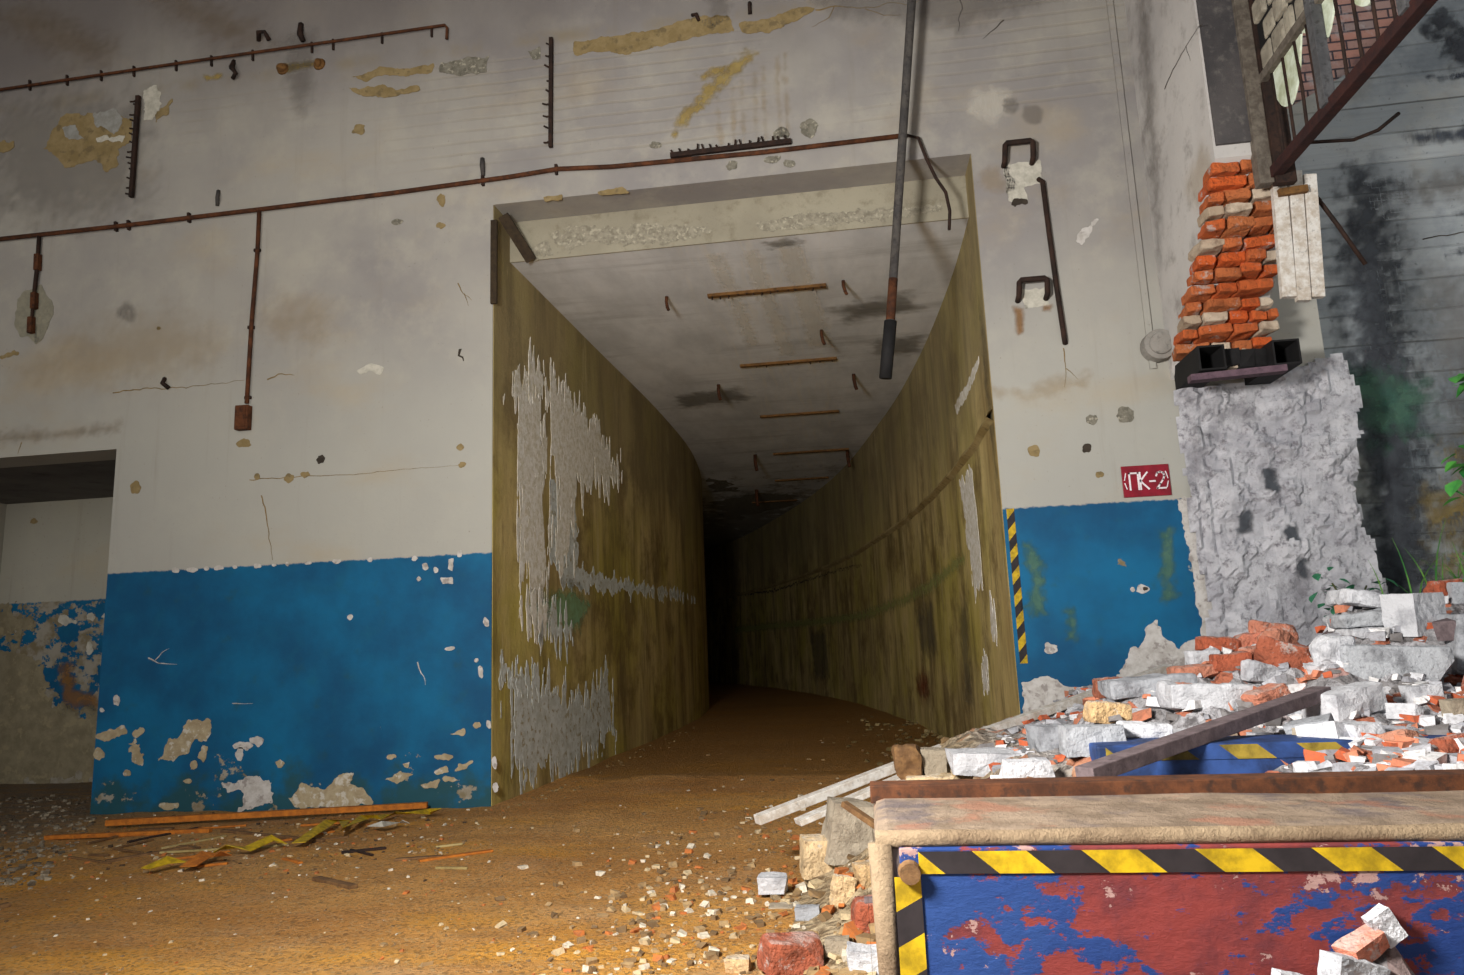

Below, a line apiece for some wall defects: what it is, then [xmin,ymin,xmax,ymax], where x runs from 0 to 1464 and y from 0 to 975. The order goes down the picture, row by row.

flaking render [573,7,815,56]
flaking render [350,56,489,98]
spalling [528,37,553,148]
flaking render [44,85,173,198]
leakage [1416,128,1464,142]
flaking render [1116,159,1389,677]
peeling [412,550,462,584]
peeling [451,337,695,795]
peeling [0,601,212,784]
peeling [1021,676,1083,713]
peeling [221,736,373,812]
peeling [386,753,473,788]